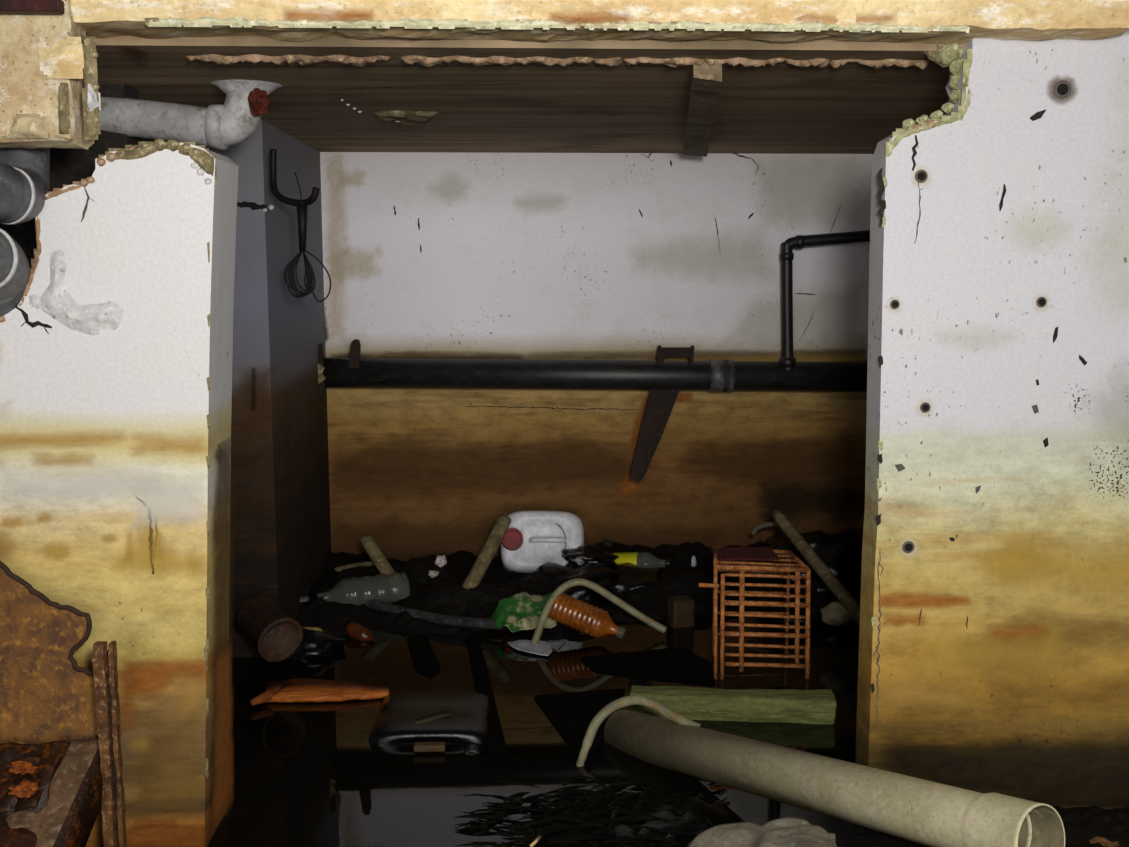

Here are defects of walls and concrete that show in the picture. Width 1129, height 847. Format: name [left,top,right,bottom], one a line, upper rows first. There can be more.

spalling [7,36,217,200]
peeling [144,16,973,227]
crack [81,187,95,222]
crack [912,135,923,244]
spalling [18,216,42,306]
crack [16,306,52,334]
spalling [878,441,905,472]
mould [1085,439,1129,501]
crack [135,495,158,574]
damp [214,448,233,822]
damp [882,596,967,625]
damp [889,739,1129,801]